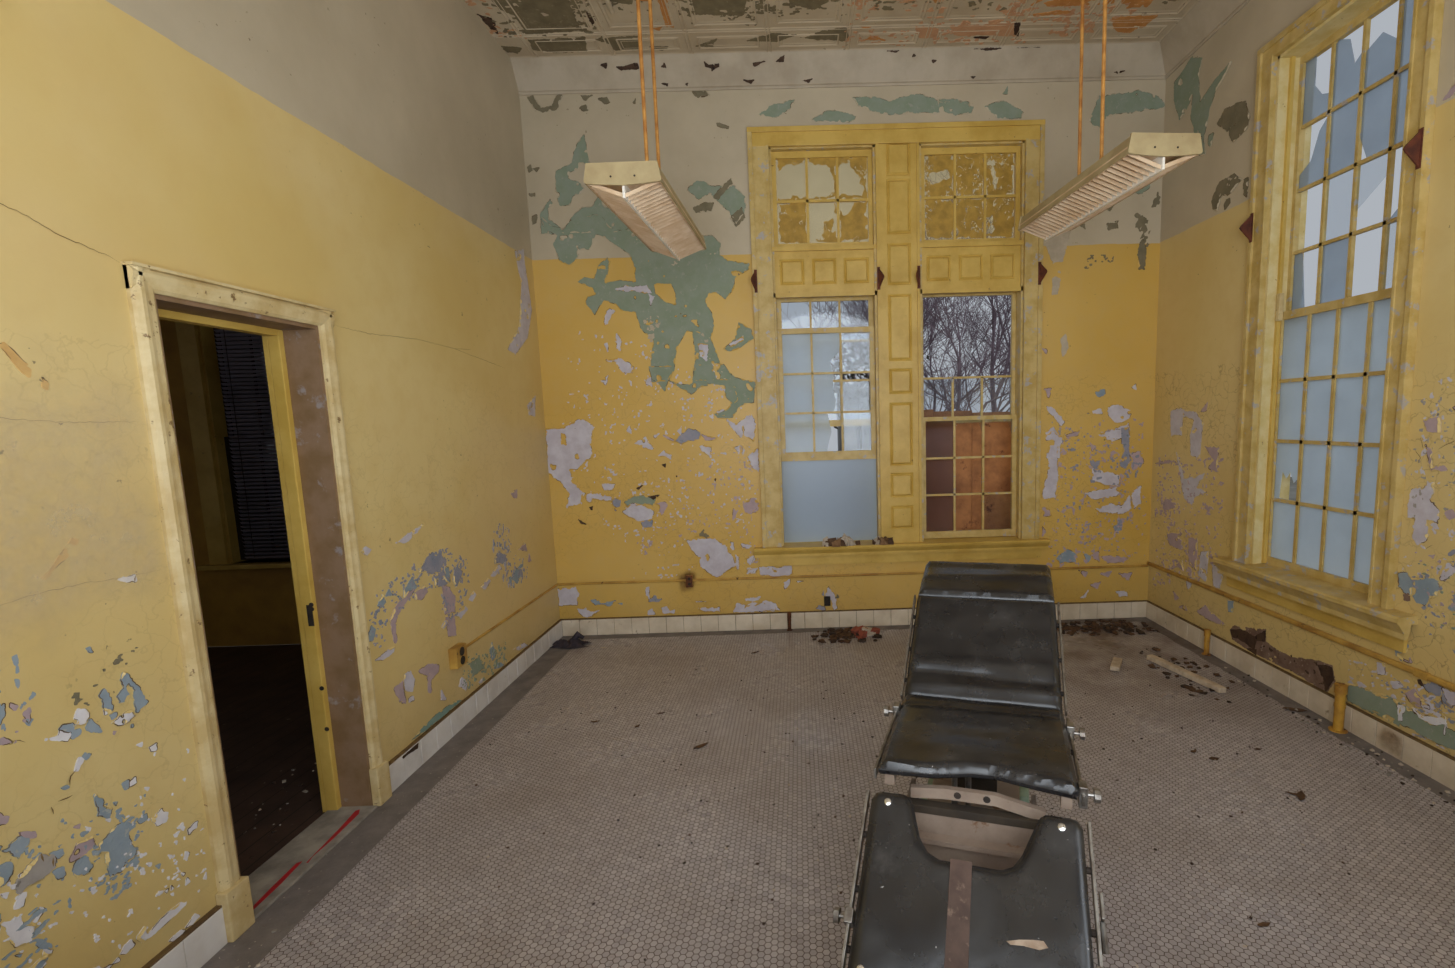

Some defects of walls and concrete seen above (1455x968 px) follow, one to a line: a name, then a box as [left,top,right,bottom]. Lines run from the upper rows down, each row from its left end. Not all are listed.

peeling [527,94,562,113]
peeling [579,95,610,112]
peeling [1089,56,1250,156]
crack [0,203,120,263]
peeling [508,249,532,355]
peeling [1045,223,1086,295]
peeling [1106,184,1161,270]
peeling [1211,173,1249,211]
peeling [527,134,803,618]
peeling [368,523,533,661]
peeling [1041,377,1455,757]
peeling [394,642,528,759]